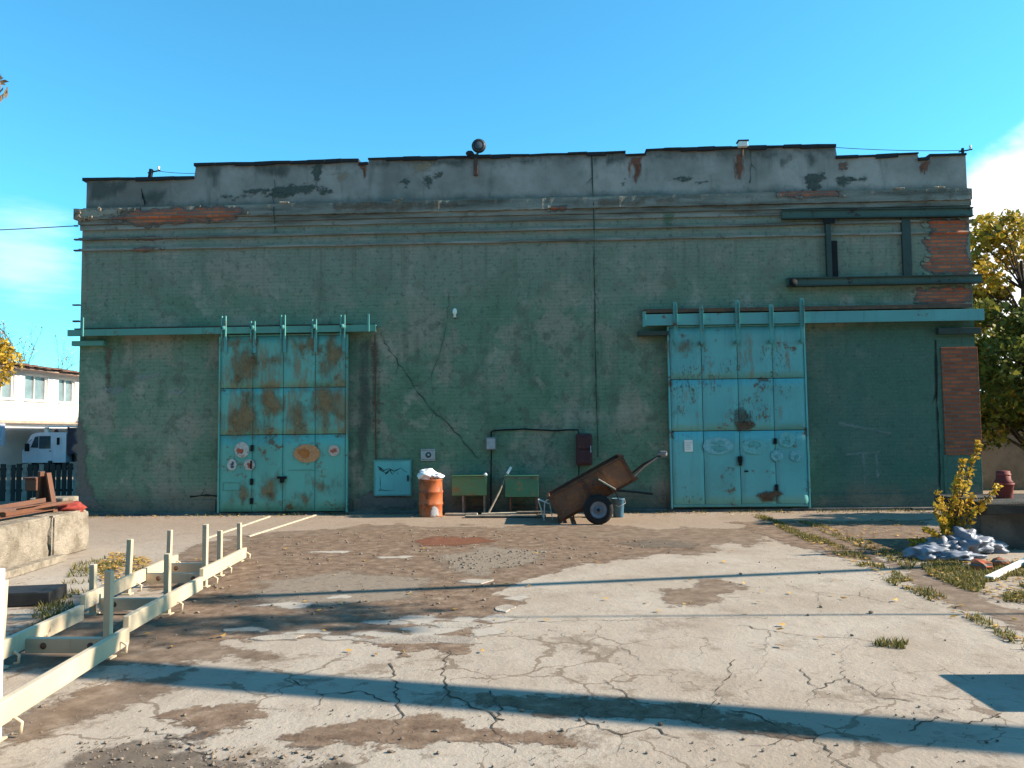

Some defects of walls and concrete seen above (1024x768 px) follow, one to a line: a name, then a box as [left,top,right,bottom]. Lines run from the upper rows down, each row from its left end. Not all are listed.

rust [628,158,641,182]
spalling [74,205,249,253]
spalling [913,217,975,304]
rust [227,337,343,434]
crack [381,293,479,459]
rust [734,395,768,430]
rust [757,490,783,502]